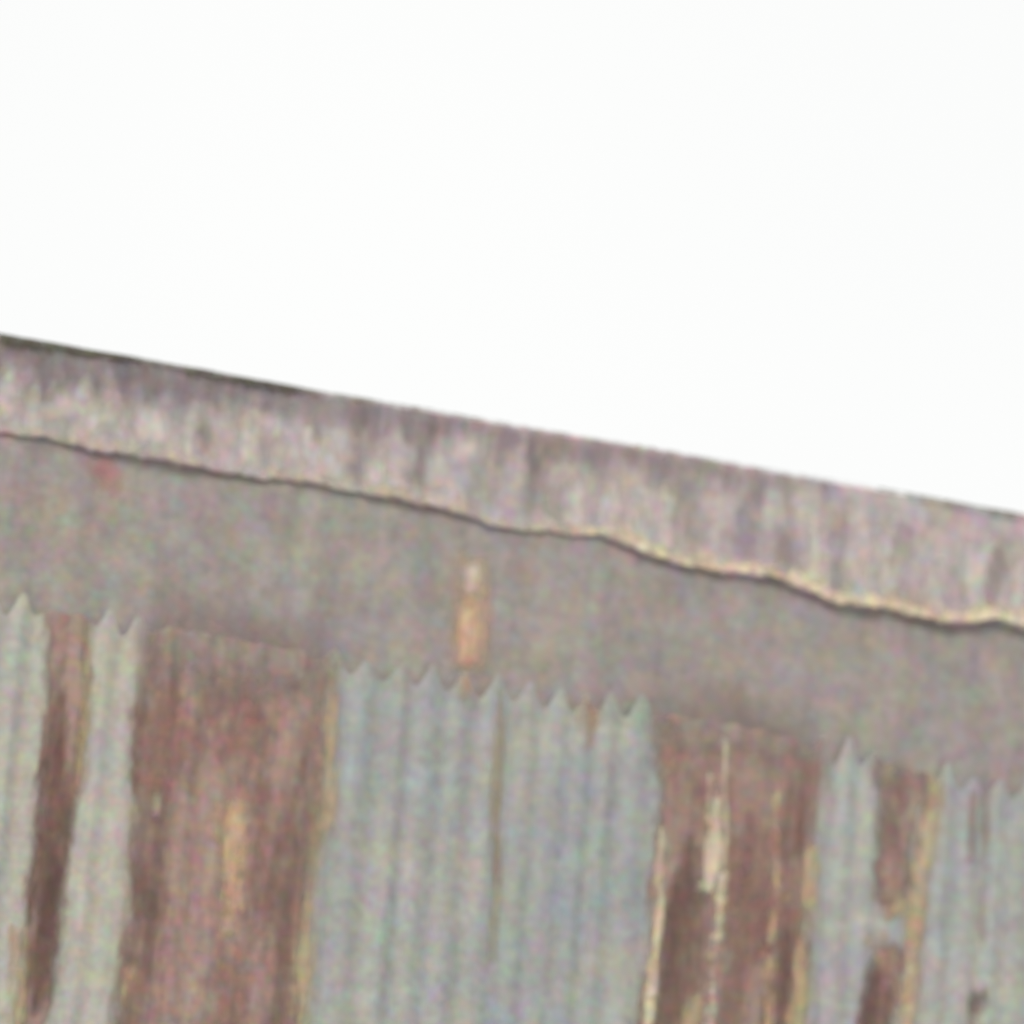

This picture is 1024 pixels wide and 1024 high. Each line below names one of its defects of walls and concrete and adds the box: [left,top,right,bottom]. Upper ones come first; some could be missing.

corrosion [457,559,487,694]
corrosion [11,610,90,1024]
corrosion [119,626,338,1024]
corrosion [637,714,821,1024]
corrosion [859,760,941,1024]